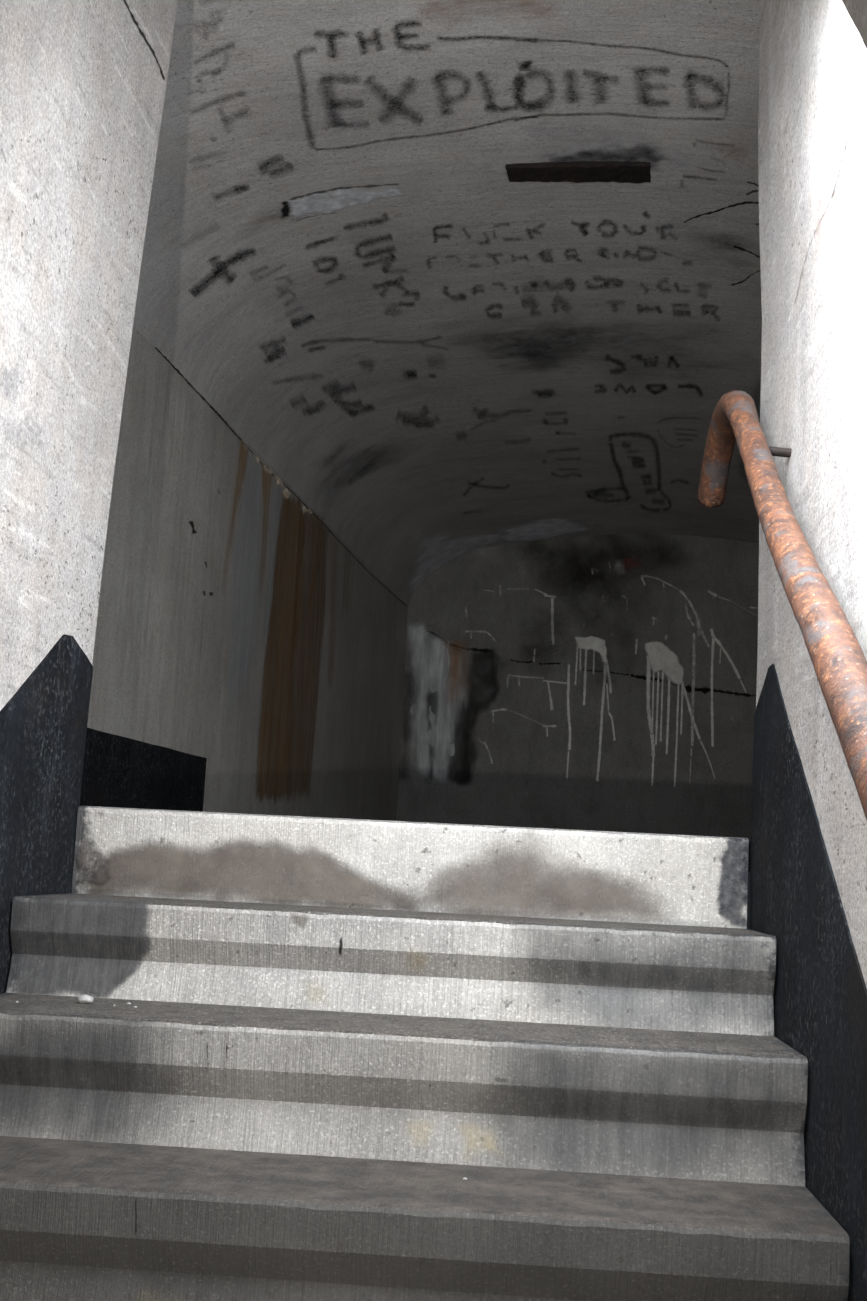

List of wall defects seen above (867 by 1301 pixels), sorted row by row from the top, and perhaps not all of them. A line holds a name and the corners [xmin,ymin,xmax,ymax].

crack [124,0,165,79]
corrosion [257,498,326,801]